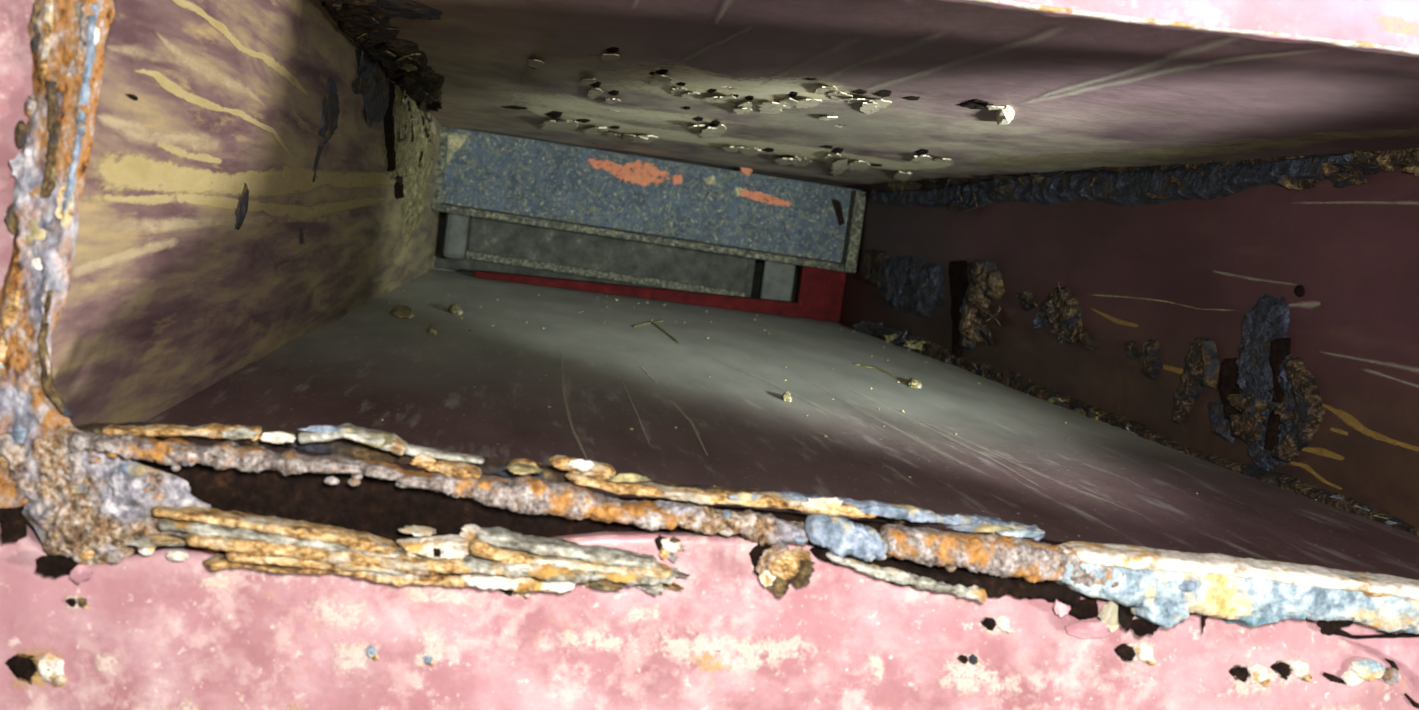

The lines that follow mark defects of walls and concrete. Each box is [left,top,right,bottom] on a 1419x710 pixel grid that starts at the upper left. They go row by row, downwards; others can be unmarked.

rust [92,49,436,247]
peeling [321,0,445,112]
peeling [648,69,952,182]
spalling [959,98,1004,111]
rust [0,0,236,458]
peeling [948,260,1099,357]
peeling [1172,285,1325,471]
rust [0,464,37,544]
rust [35,555,94,583]
spalling [500,589,530,599]
rust [65,422,1419,640]
rust [939,662,1030,697]